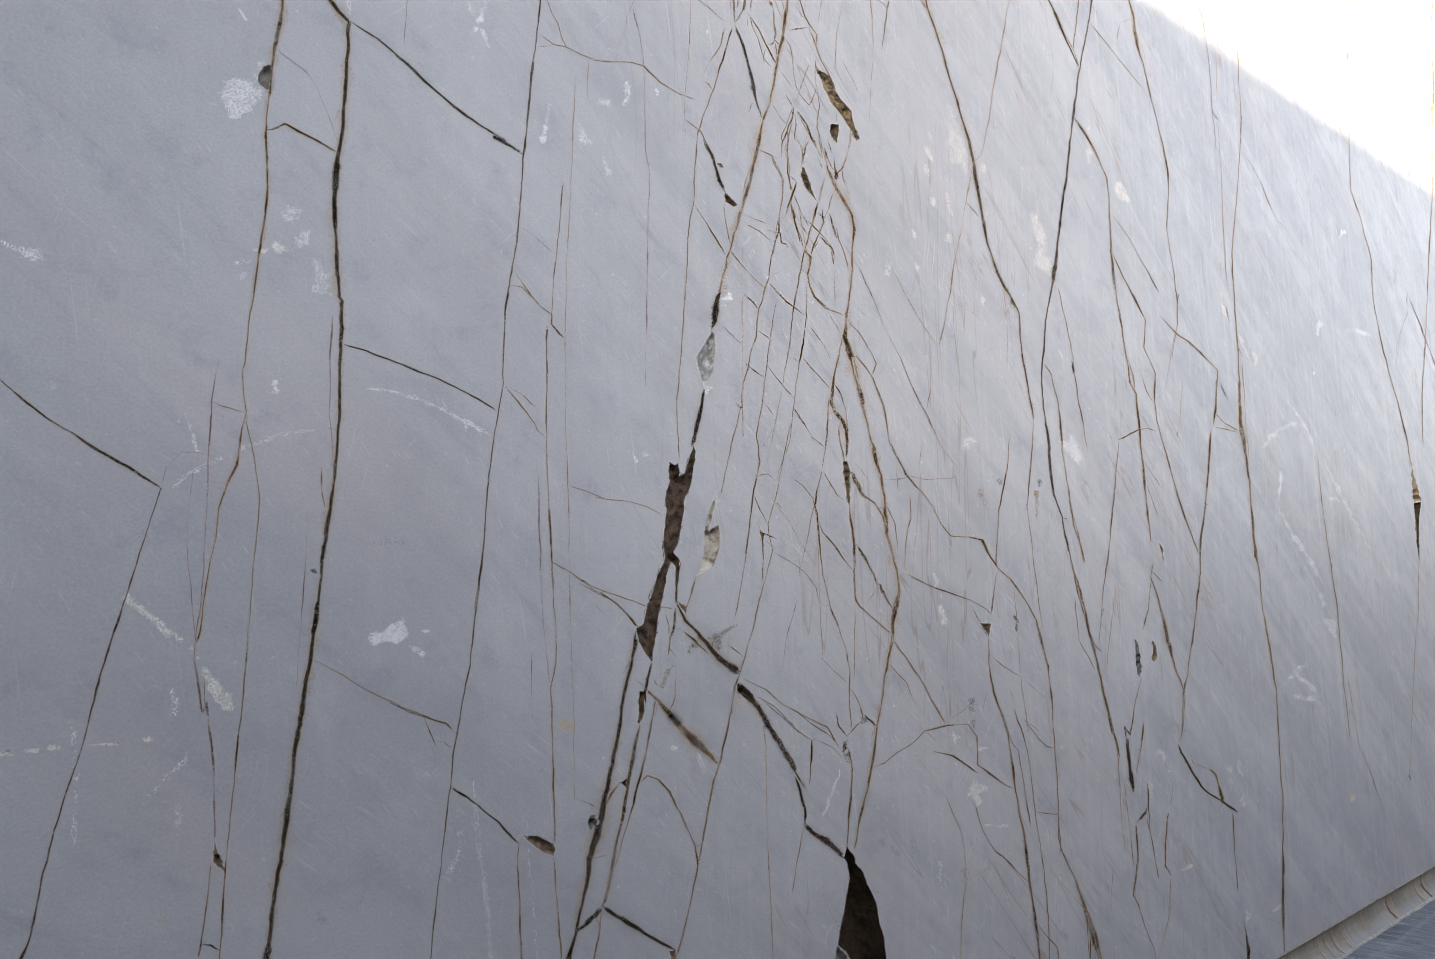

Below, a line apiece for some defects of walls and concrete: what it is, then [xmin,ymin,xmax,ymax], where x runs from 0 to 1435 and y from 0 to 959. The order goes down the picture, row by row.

spalling [814,62,860,145]
crack [1342,0,1435,464]
crack [0,0,1102,959]
spalling [635,444,722,662]
crack [1040,0,1287,959]
crack [1317,453,1420,813]
peeling [825,844,887,959]